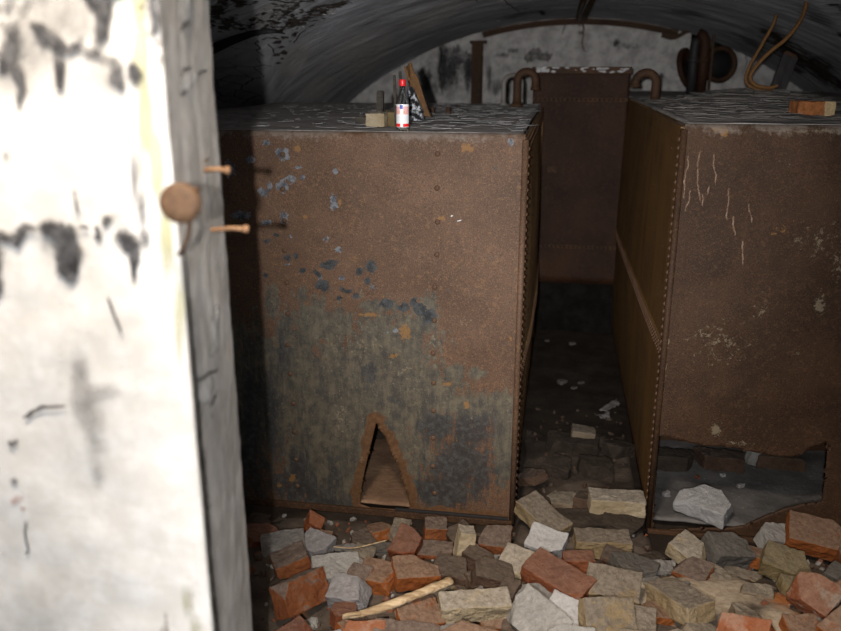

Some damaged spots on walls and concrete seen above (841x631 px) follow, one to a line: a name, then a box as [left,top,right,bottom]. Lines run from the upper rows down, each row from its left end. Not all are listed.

peeling [210,0,350,64]
corrosion [683,153,717,210]